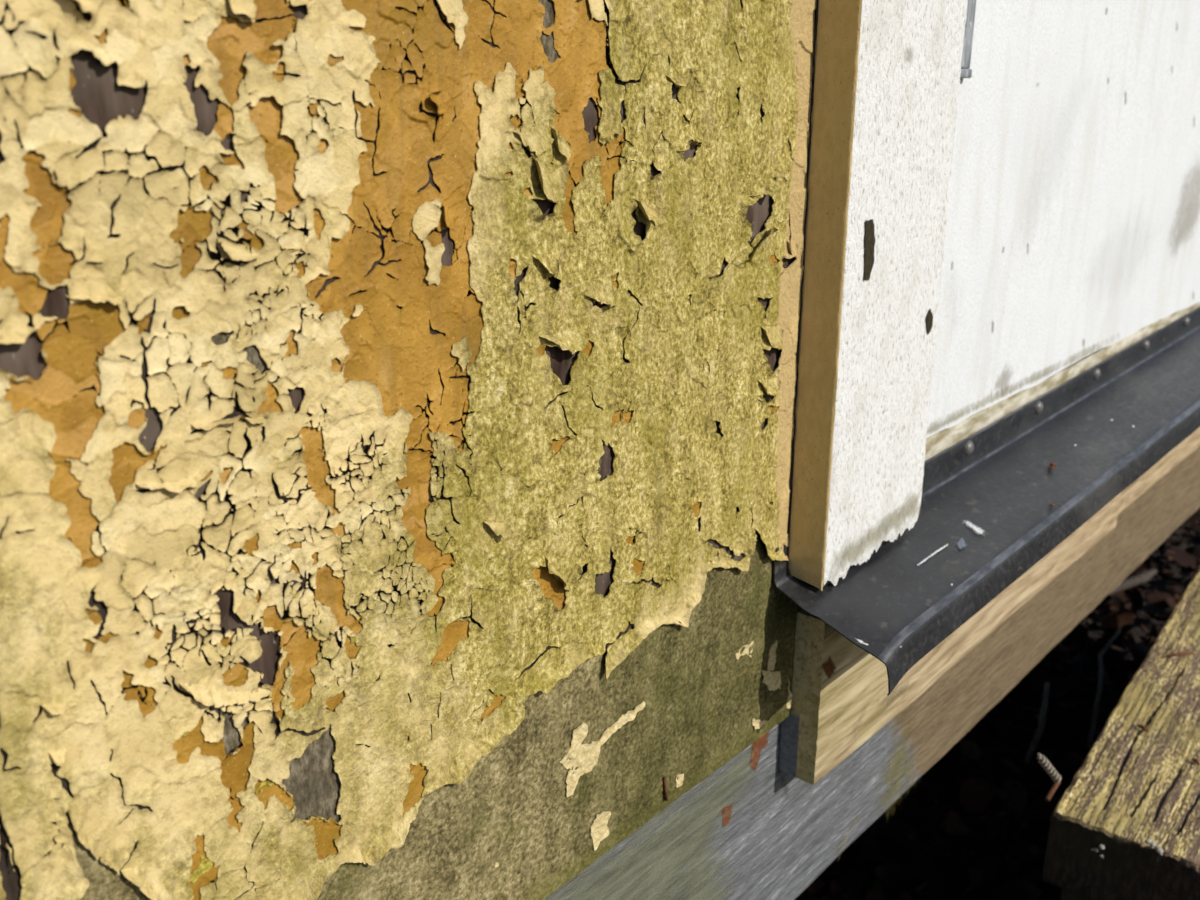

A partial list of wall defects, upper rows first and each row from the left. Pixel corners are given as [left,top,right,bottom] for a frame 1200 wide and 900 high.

crack [352,91,386,176]
crack [417,123,444,193]
crack [70,195,178,272]
crack [315,203,401,298]
crack [120,298,155,406]
peeling [0,125,177,734]
crack [135,467,207,493]
crack [271,475,312,503]
peeling [40,0,799,900]
crack [51,771,74,798]
peeling [0,777,15,900]
crack [0,824,22,900]